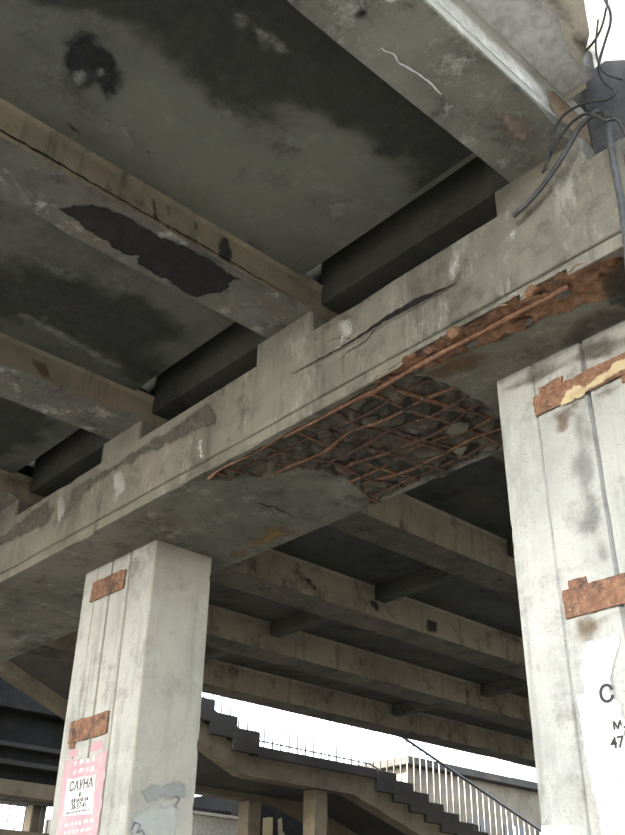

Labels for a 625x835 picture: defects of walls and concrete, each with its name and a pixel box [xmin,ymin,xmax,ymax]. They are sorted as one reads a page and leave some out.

spalling [60,204,239,298]
crack [291,283,456,374]
spalling [207,257,625,503]
corrosion [526,370,552,382]
corrosion [576,339,617,360]
corrosion [579,621,596,634]